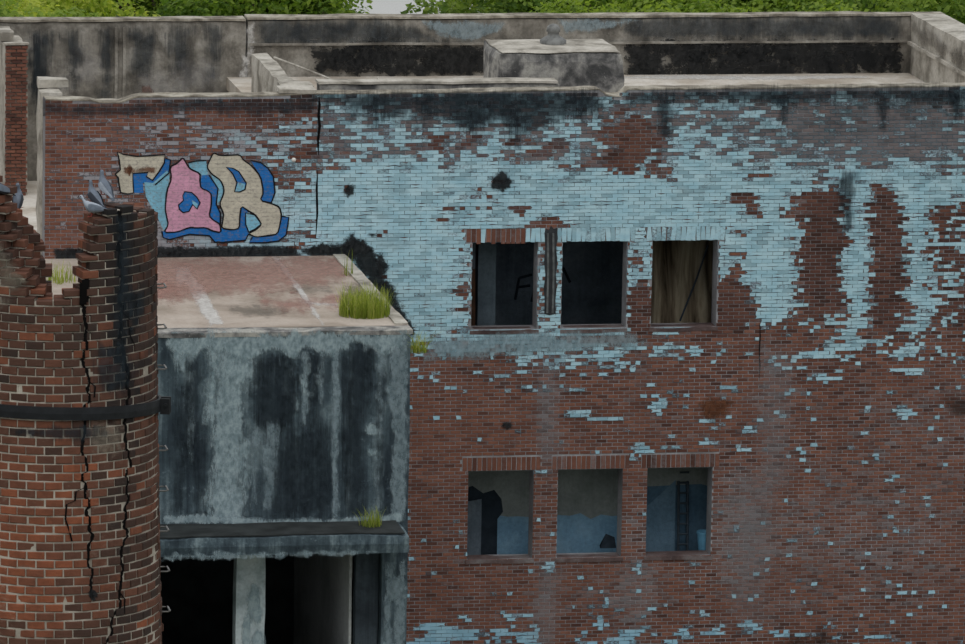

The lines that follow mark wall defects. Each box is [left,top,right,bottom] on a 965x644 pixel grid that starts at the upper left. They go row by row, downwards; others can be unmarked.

damp [241,19,503,77]
crack [314,98,322,232]
damp [54,248,84,259]
peeling [795,192,848,321]
peeling [865,184,912,331]
peeling [928,202,965,330]
crack [65,282,96,591]
crack [106,211,135,644]
damp [157,234,415,524]
peeling [768,336,861,384]
peeling [883,342,934,375]
peeling [406,611,541,644]